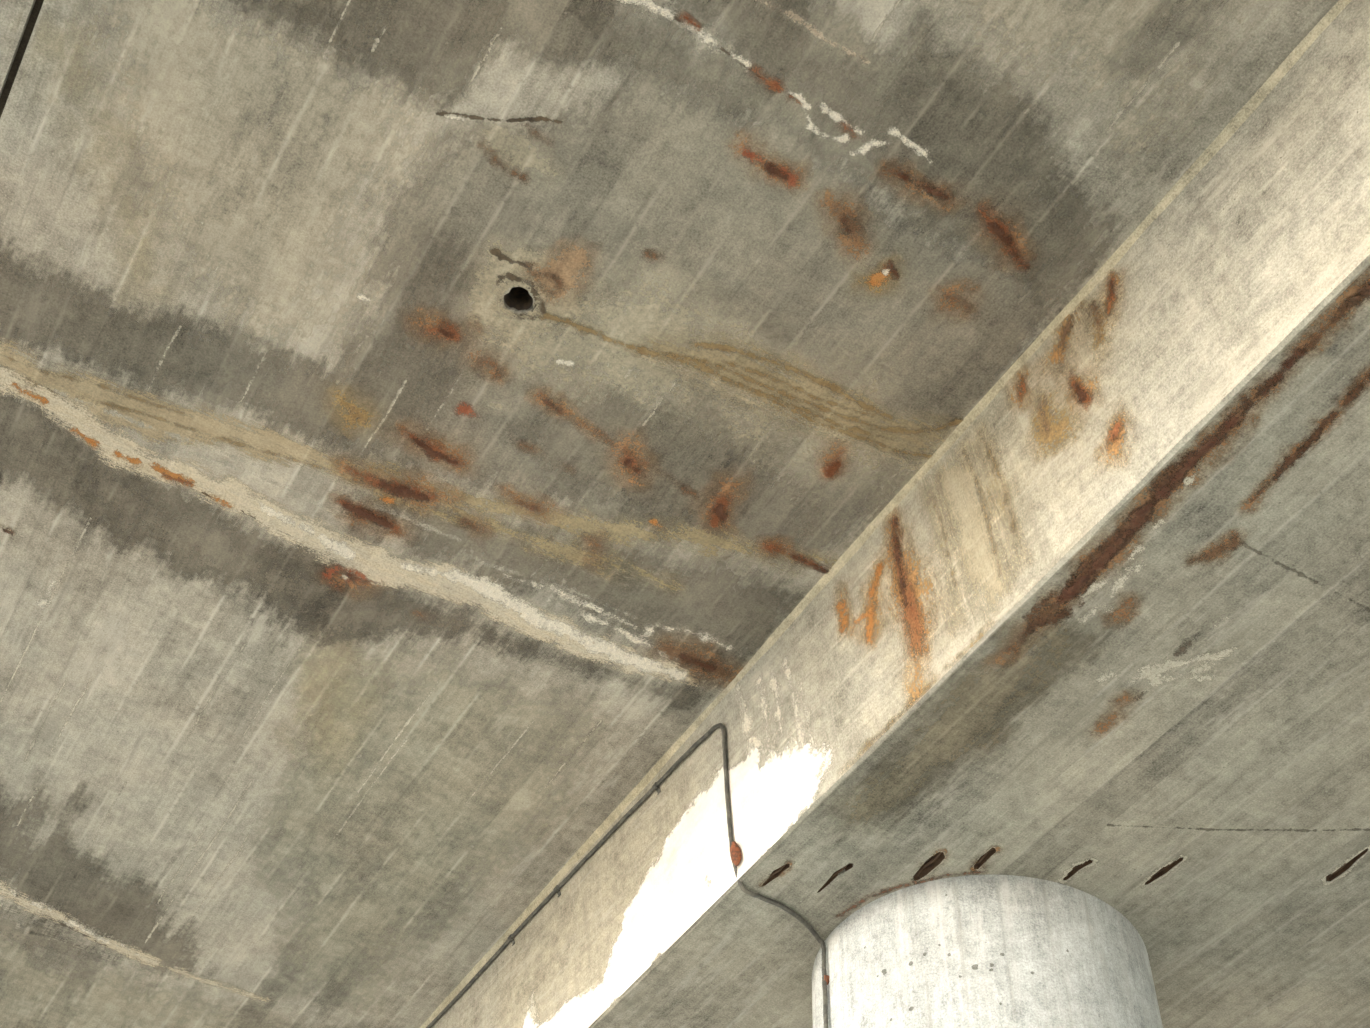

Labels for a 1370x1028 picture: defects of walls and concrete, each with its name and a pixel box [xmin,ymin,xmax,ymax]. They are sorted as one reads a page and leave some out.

crack [436,111,563,124]
crack [619,0,931,163]
rust [729,131,900,295]
rust [330,421,493,541]
crack [0,339,837,687]
damp [0,0,1115,827]
rust [1010,272,1122,459]
rust [836,510,936,702]
damp [0,785,197,979]
crack [0,880,270,1002]
spalling [759,861,792,887]
spalling [817,863,853,893]